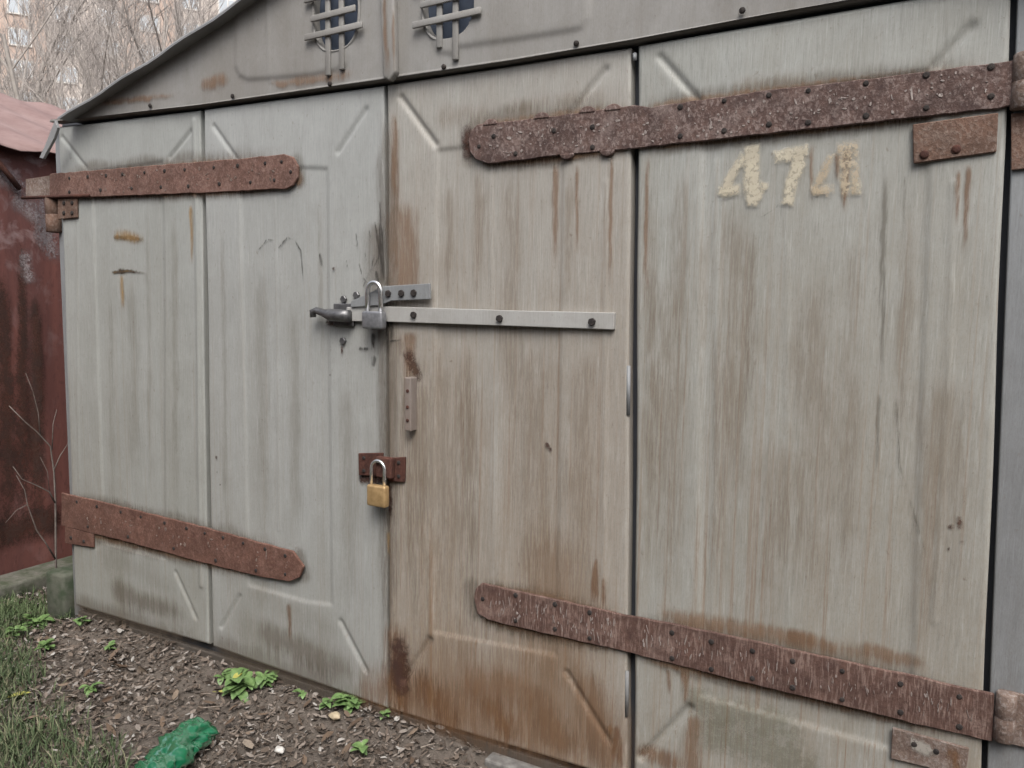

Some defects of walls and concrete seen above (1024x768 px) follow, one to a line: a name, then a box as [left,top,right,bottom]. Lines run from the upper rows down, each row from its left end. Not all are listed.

rust [462,128,471,158]
rust [957,170,971,235]
rust [114,232,140,242]
rust [404,352,420,378]
rust [0,248,61,548]